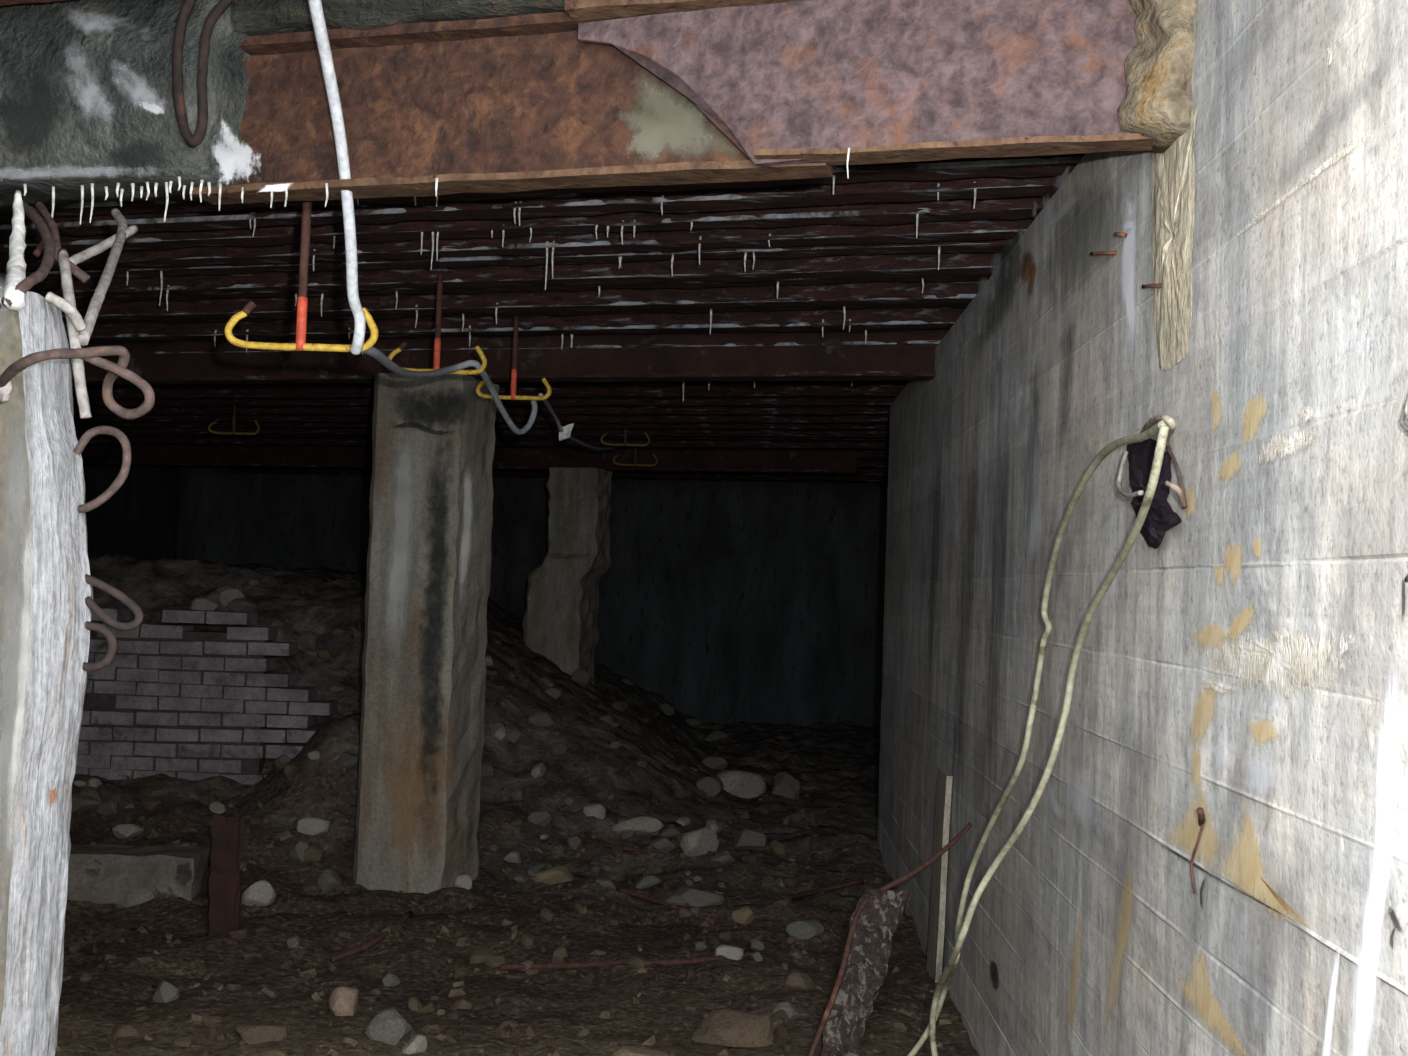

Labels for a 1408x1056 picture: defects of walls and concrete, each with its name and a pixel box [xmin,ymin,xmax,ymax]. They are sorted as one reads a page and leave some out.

leakage [400,393,466,427]
leakage [388,451,412,635]
leakage [422,473,472,768]
crack [1161,845,1294,921]